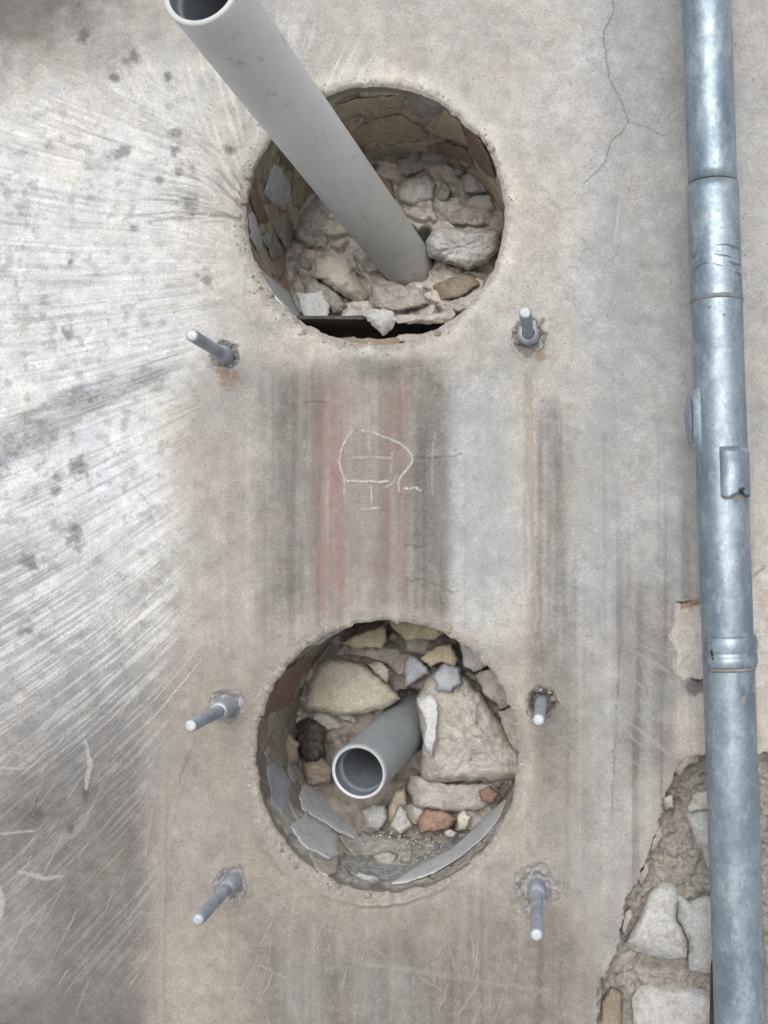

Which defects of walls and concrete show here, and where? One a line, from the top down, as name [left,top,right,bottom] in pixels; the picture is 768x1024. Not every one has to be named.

flaking render [668,599,703,693]
flaking render [752,563,768,689]
spalling [600,756,712,1024]
spalling [758,752,768,1024]